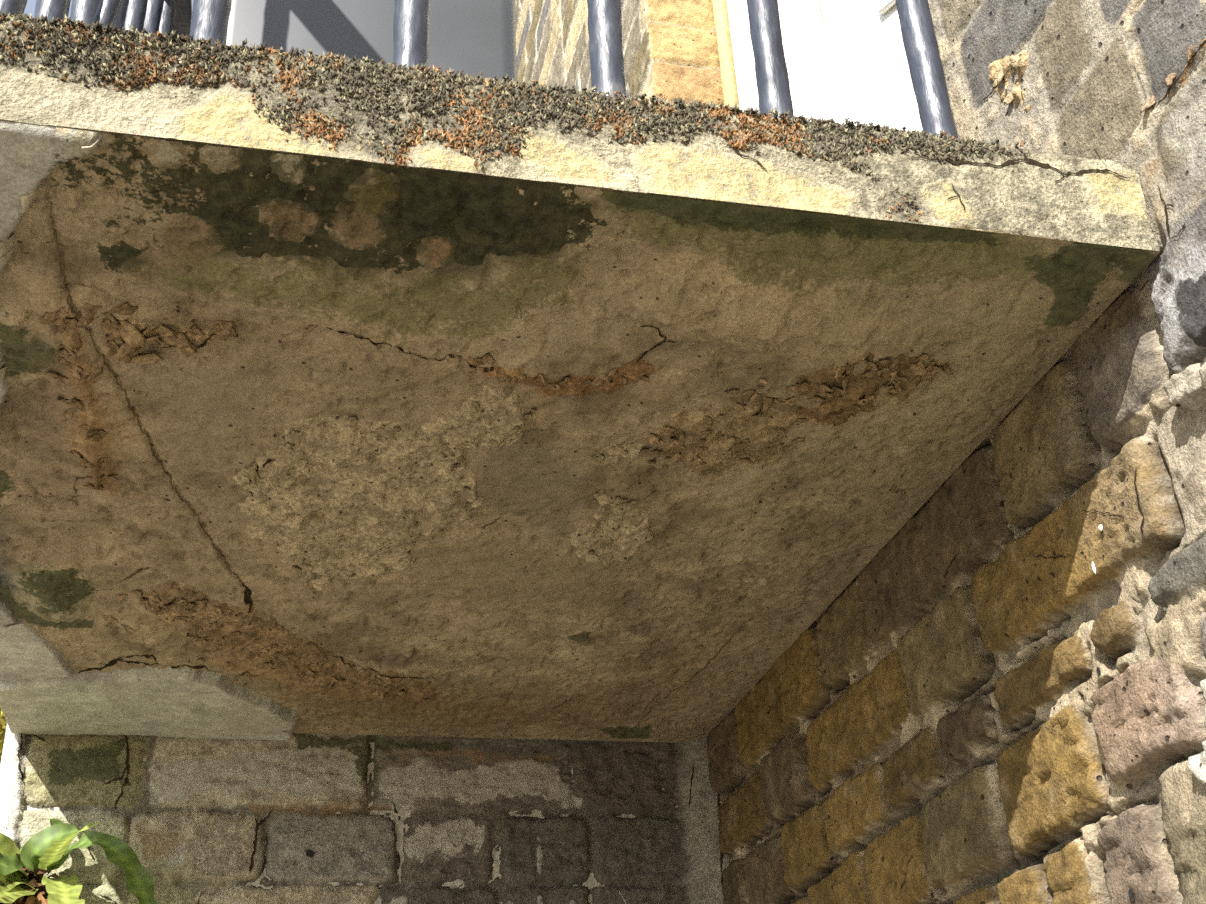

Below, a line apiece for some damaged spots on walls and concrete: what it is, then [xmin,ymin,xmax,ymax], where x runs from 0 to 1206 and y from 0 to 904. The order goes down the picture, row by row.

spalling [988,50,1031,112]
crack [1154,40,1206,108]
peeling [0,121,102,275]
water stain [0,64,632,274]
crack [901,146,1185,238]
peeling [38,302,239,442]
crack [45,192,253,605]
crack [281,325,468,363]
spalling [640,353,953,481]
water stain [0,469,19,520]
water stain [0,574,98,630]
peeling [0,581,436,741]